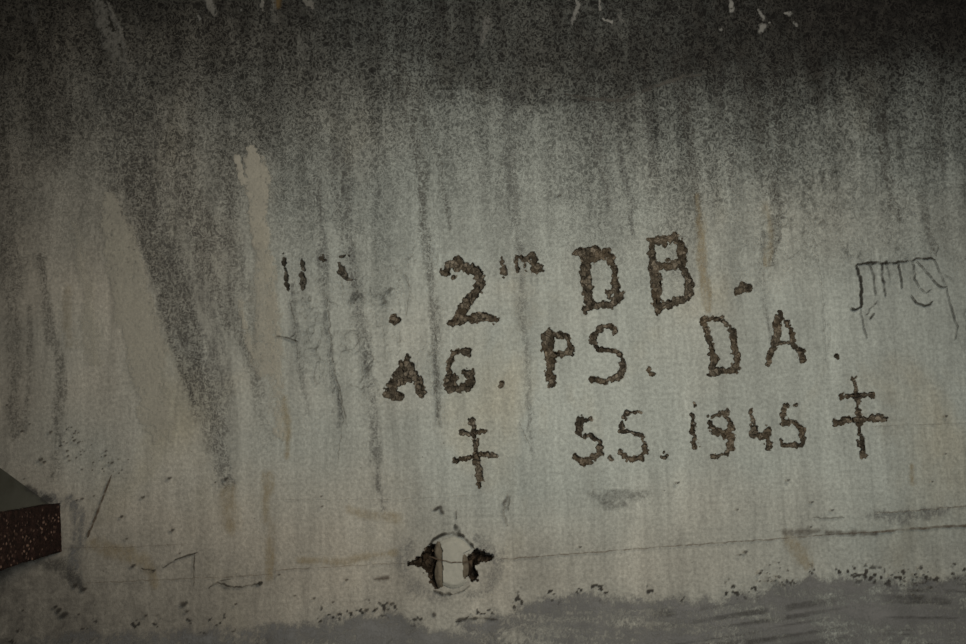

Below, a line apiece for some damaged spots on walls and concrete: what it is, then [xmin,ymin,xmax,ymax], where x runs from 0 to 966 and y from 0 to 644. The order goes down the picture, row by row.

spalling [197,0,217,21]
spalling [407,512,494,595]